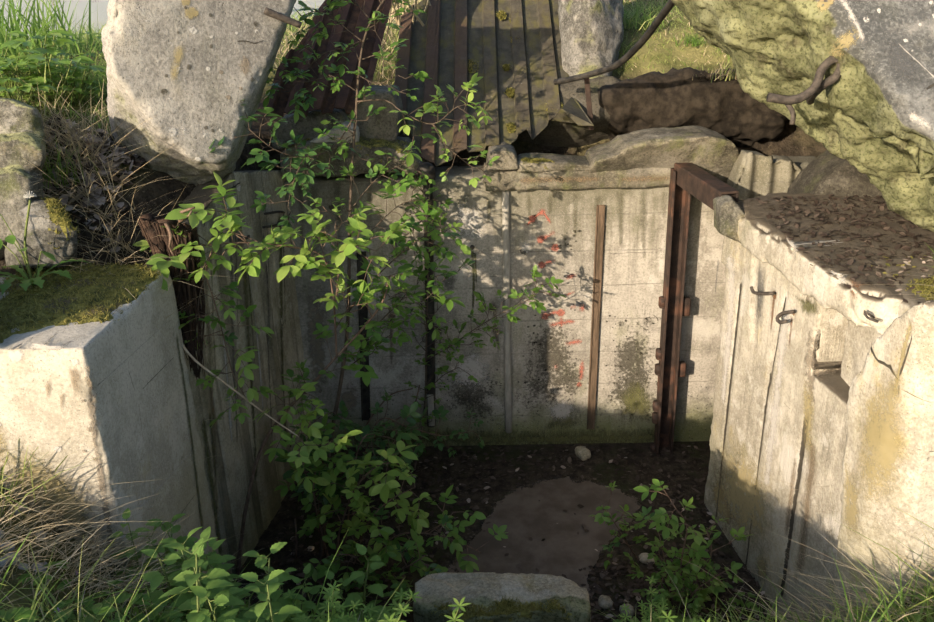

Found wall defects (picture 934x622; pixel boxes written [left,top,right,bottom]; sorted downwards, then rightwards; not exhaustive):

damp [459,209,479,236]
damp [444,355,502,418]
damp [518,315,580,419]
mould [603,315,657,419]
crack [871,336,929,402]